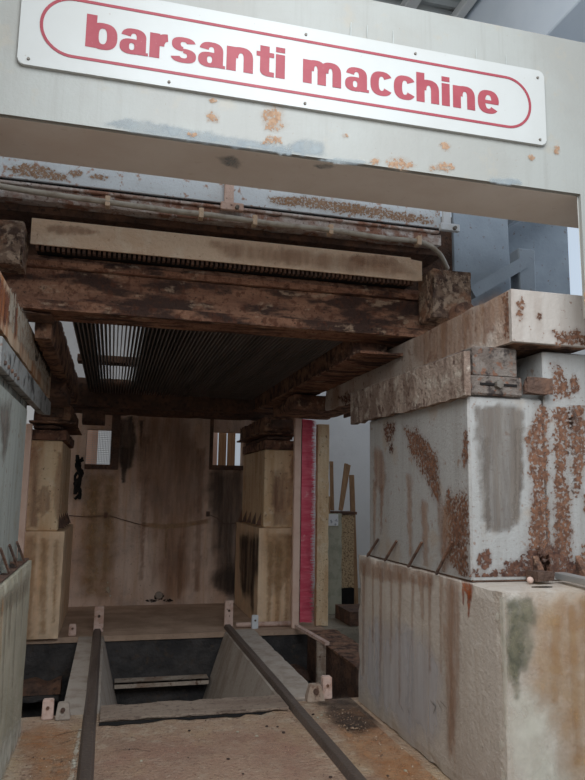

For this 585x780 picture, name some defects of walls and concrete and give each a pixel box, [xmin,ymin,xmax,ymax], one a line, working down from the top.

rust [261,108,284,144]
rust [371,158,413,170]
rust [552,328,585,346]
rust [375,362,585,617]
leakage [507,599,553,780]